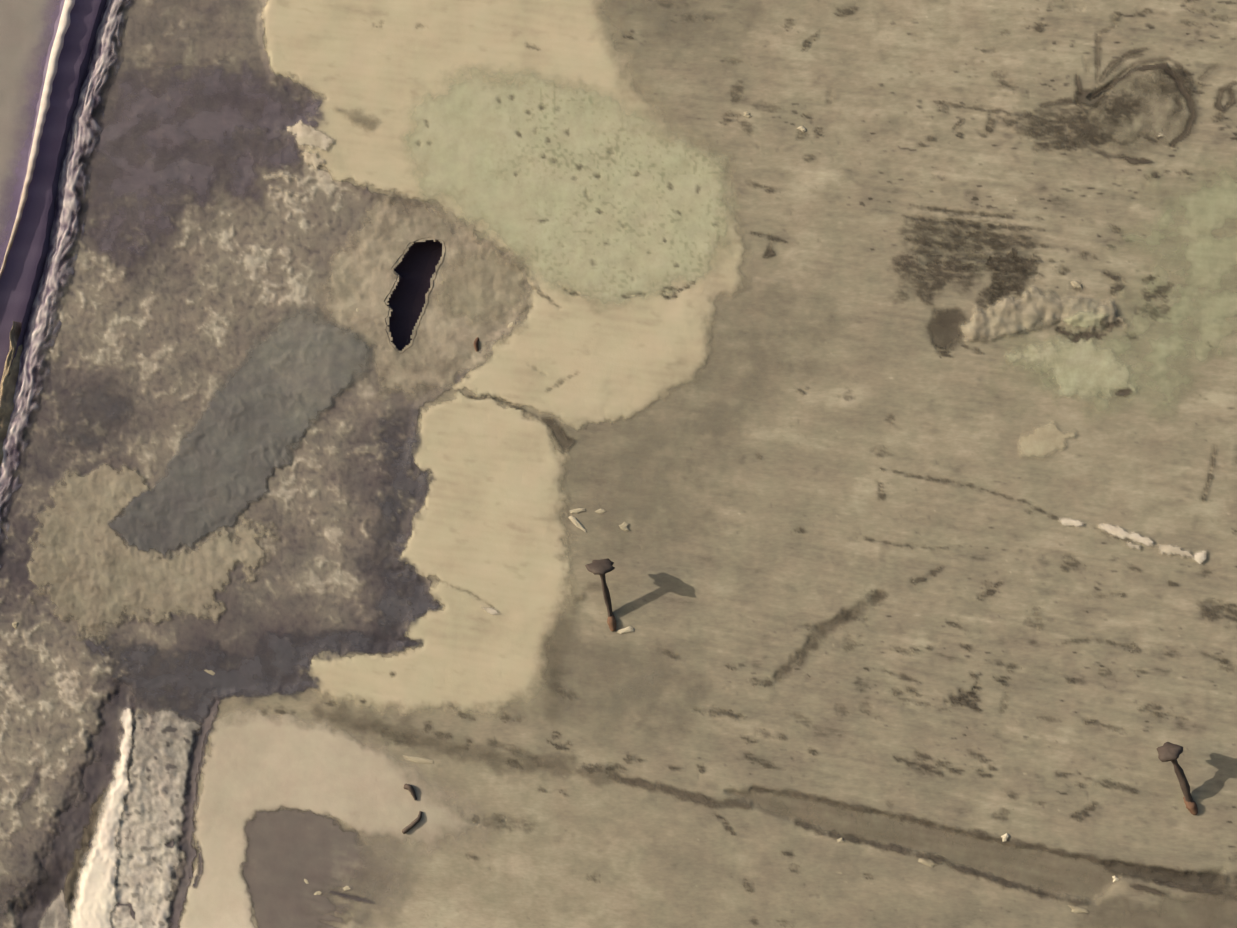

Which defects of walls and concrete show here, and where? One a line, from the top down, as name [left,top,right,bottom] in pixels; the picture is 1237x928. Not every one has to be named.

damp [405,68,727,303]
damp [906,208,1054,304]
spalling [0,0,745,928]
corrosion [607,614,616,631]
corrosion [1183,797,1198,815]
damp [241,808,403,928]